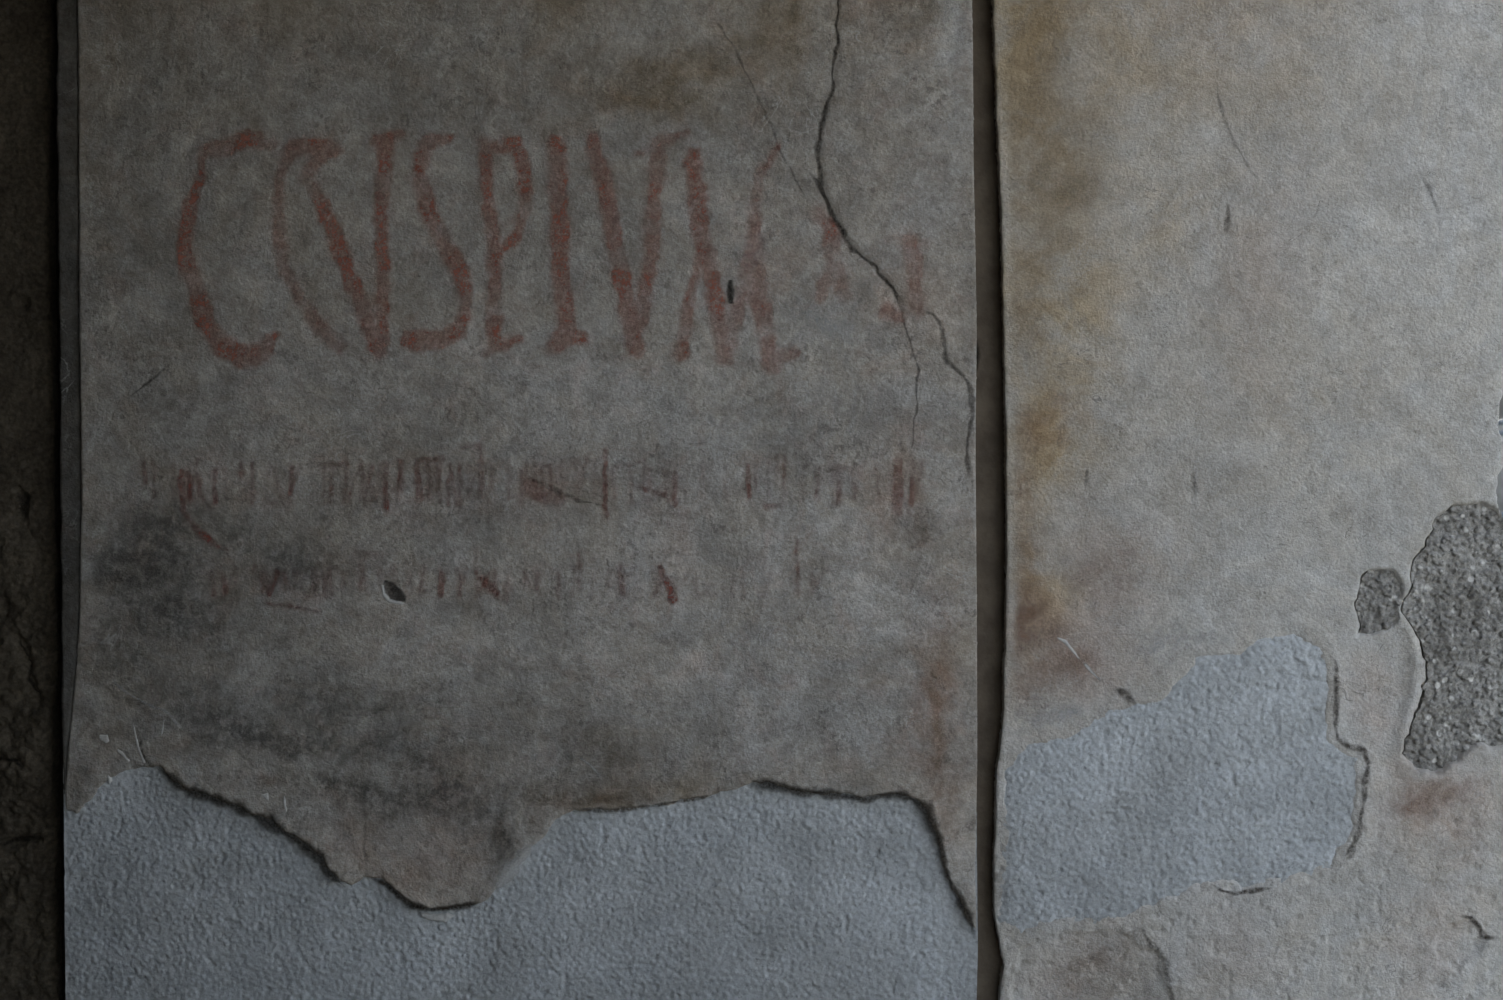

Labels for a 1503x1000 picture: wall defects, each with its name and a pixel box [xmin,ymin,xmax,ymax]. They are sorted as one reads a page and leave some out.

crack [813,0,979,469]
flaking render [1354,504,1503,771]
flaking render [63,724,978,1000]